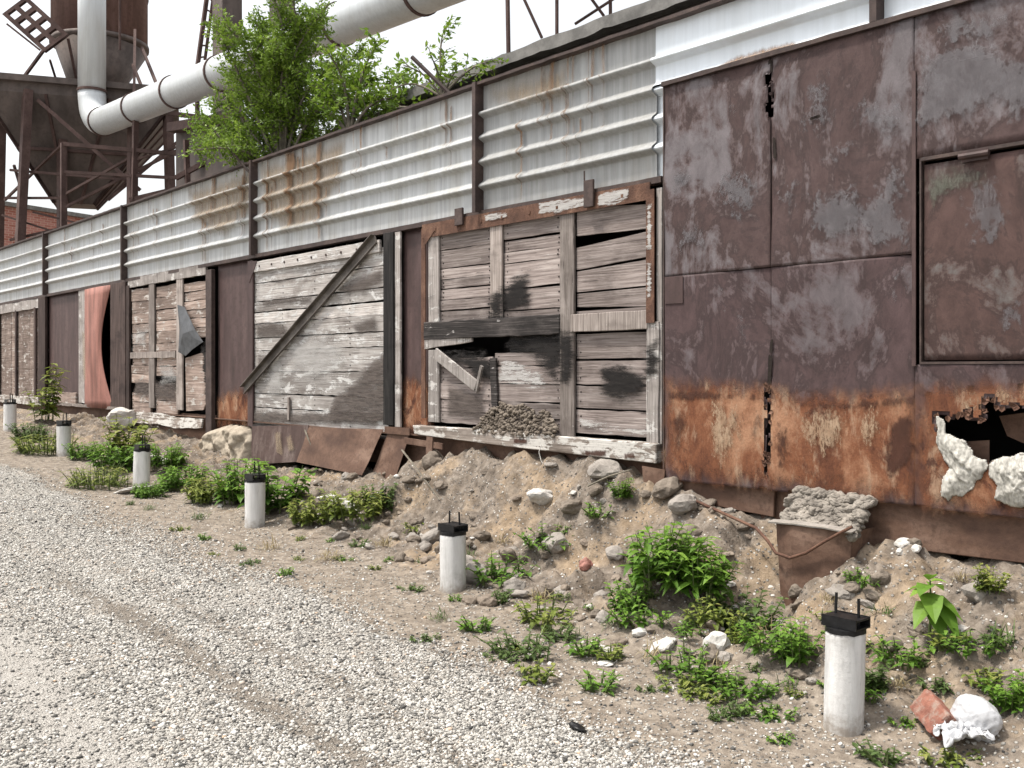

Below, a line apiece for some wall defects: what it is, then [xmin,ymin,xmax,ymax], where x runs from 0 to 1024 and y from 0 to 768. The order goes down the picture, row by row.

peeling [917,16,1024,127]
corrosion [171,143,342,249]
peeling [539,198,583,214]
peeling [598,189,629,205]
peeling [811,169,907,244]
peeling [931,175,1003,243]
corrosion [217,393,252,428]
corrosion [402,380,429,429]
crack [761,339,776,484]
corrosion [667,383,1024,512]
peeling [935,396,1020,433]